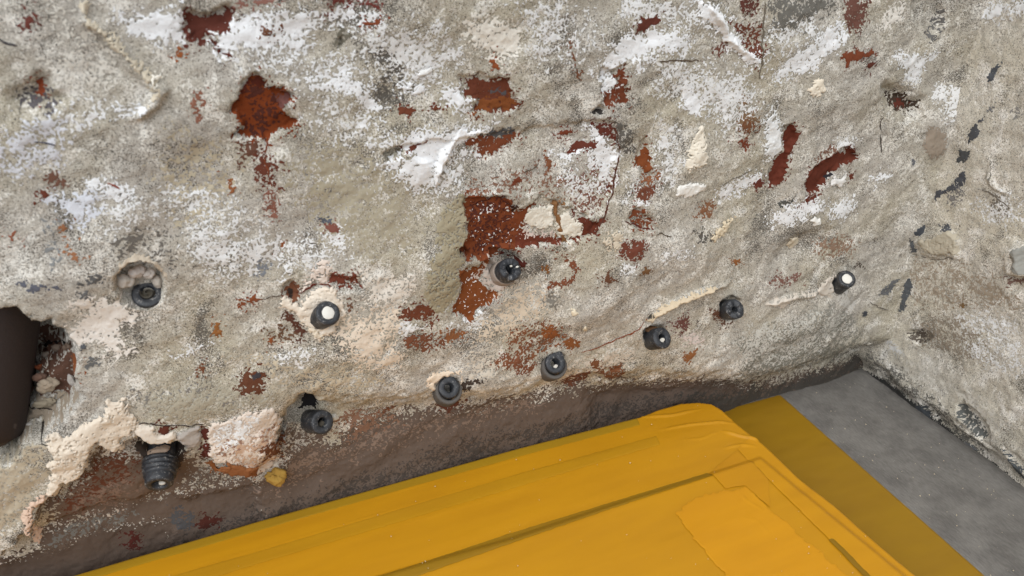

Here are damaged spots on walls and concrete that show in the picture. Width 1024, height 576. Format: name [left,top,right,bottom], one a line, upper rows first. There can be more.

corrosion [236,80,290,223]
corrosion [467,88,520,119]
flaking render [396,135,663,358]
flaking render [20,358,291,544]
water stain [0,290,1024,576]
corrosion [494,318,581,371]